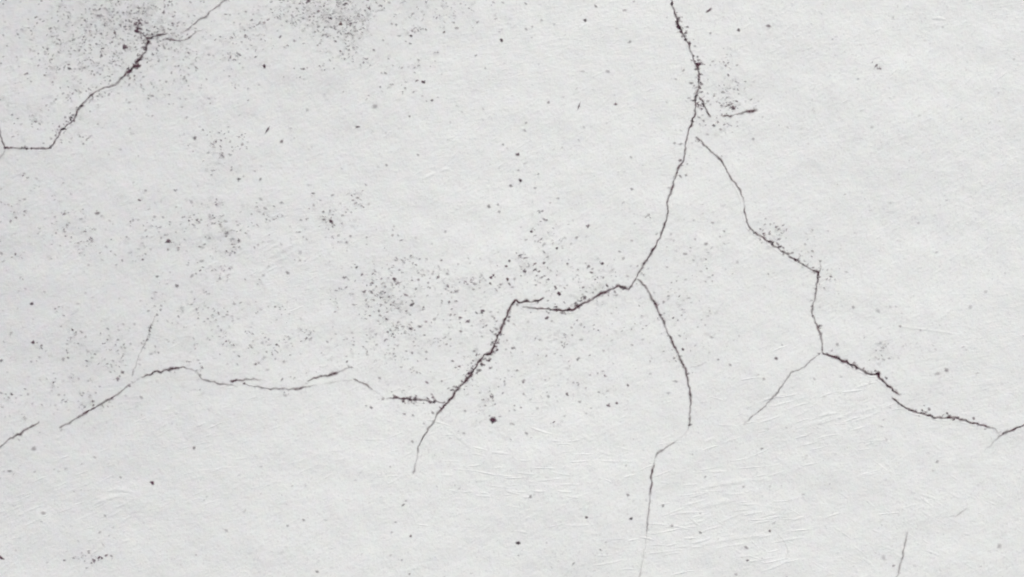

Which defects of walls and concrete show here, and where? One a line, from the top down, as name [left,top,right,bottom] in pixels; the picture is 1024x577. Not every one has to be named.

crack [0,24,172,152]
crack [392,2,1024,470]